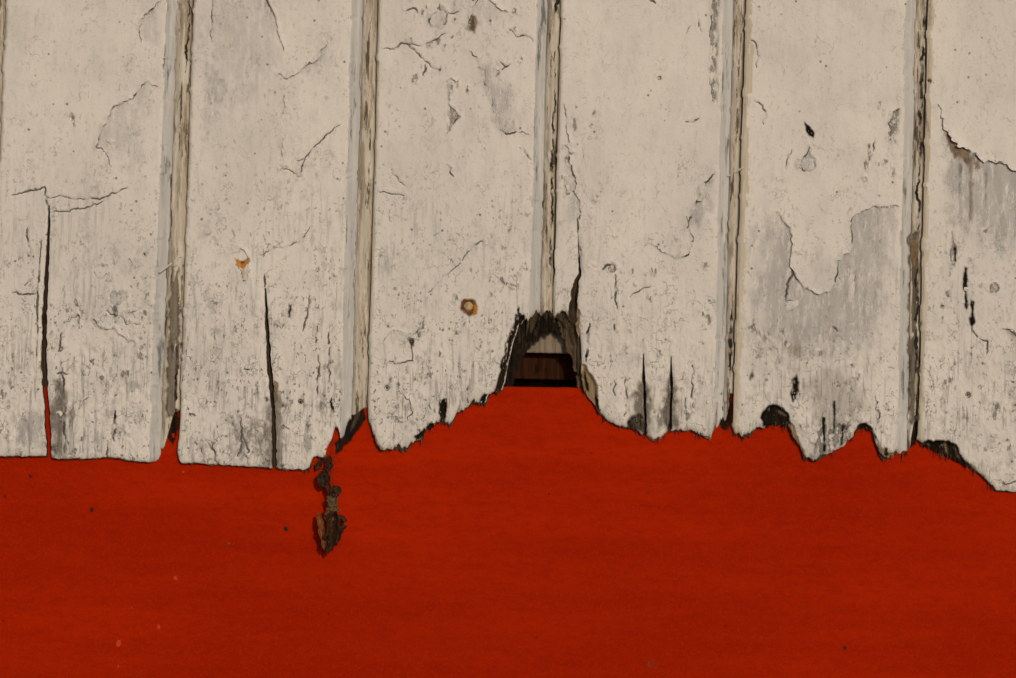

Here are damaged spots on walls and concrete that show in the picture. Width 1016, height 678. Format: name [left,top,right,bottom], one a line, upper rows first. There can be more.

leakage [947,134,978,167]
peeling [783,203,897,299]
crack [13,186,126,457]
crack [201,227,310,467]
rust [461,299,477,316]